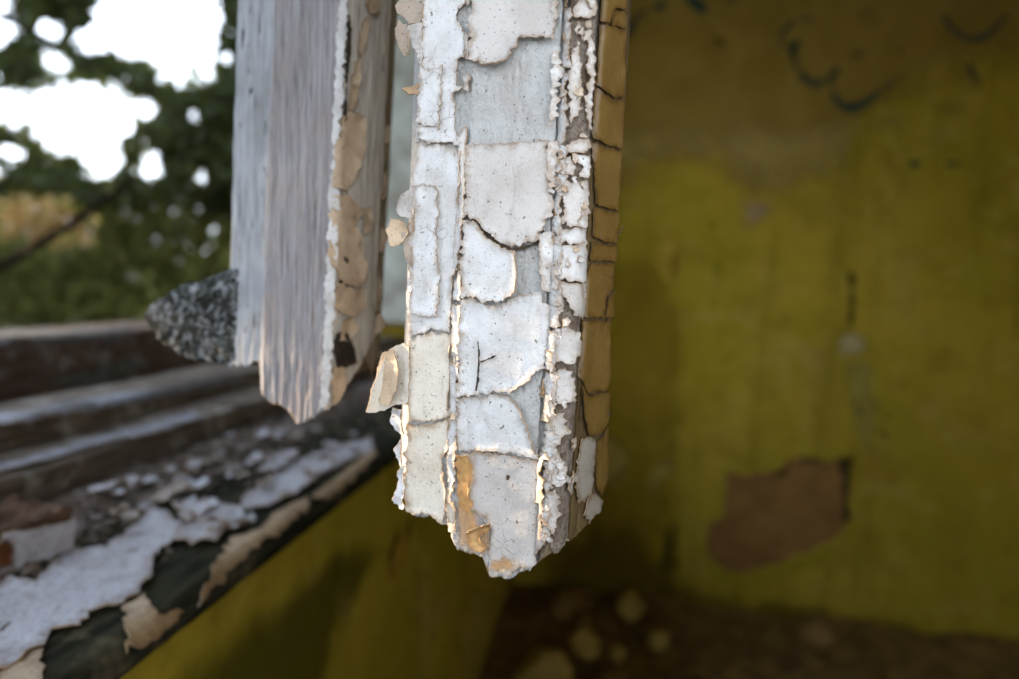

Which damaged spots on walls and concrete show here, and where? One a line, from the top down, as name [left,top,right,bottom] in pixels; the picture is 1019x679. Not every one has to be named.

peeling [0,327,136,348]
peeling [0,360,246,425]
peeling [0,410,202,471]
peeling [0,436,378,679]